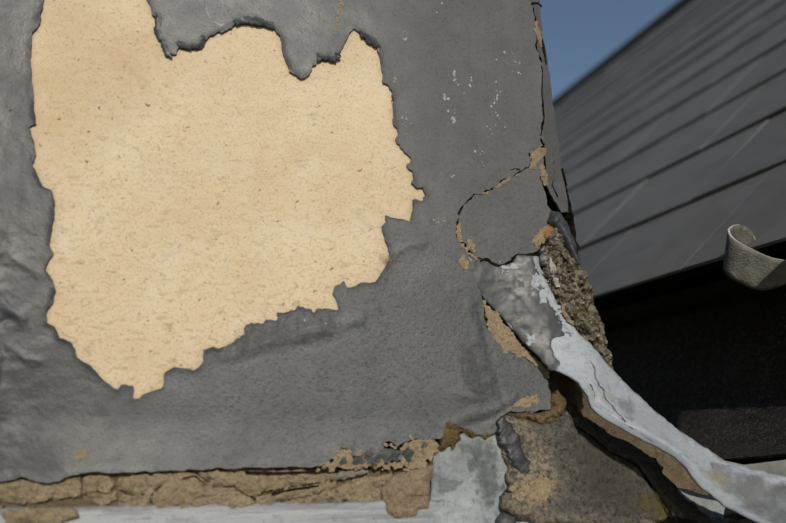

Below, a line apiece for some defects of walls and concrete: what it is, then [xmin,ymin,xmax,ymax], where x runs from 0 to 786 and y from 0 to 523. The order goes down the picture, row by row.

crack [531,2,547,65]
peeling [30,0,425,399]
crack [455,106,558,267]
peeling [530,224,574,336]
spalling [481,300,550,379]
spalling [512,394,539,413]
peeling [316,435,439,472]
spalling [508,472,559,510]